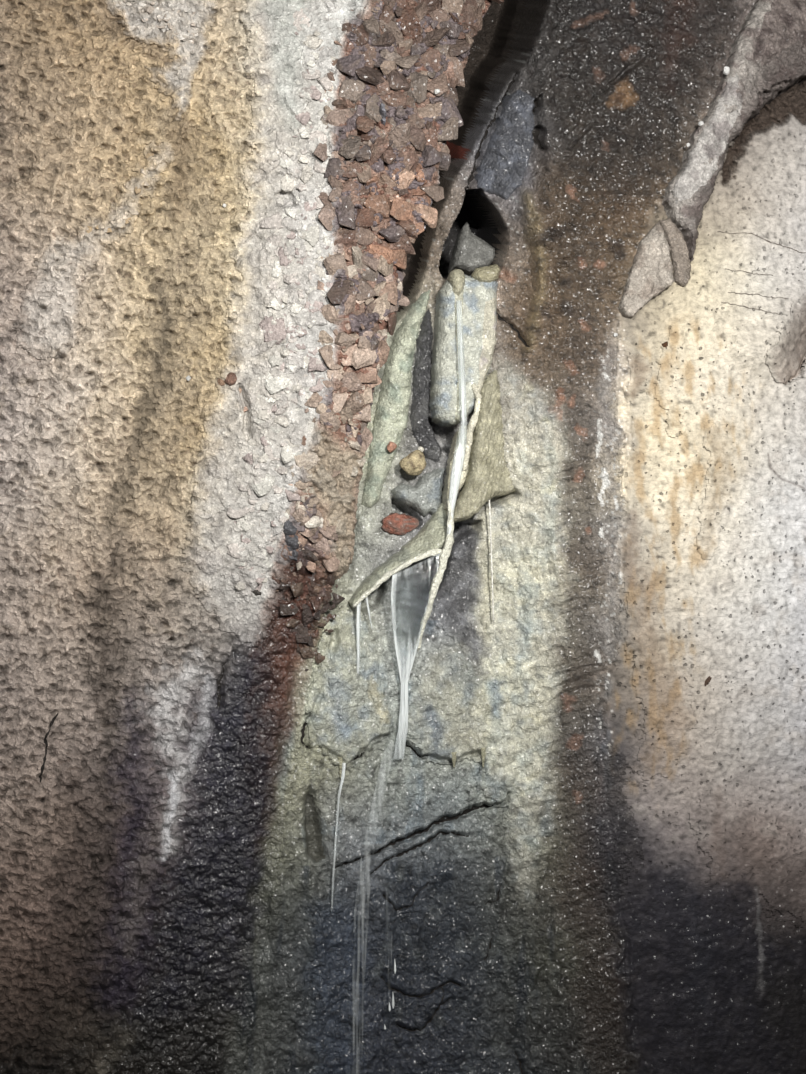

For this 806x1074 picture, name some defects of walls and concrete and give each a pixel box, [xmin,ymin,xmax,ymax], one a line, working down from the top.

crack [397,0,532,312]
crack [533,96,543,150]
flaking render [180,0,504,671]
crack [496,310,530,347]
rust [250,530,335,847]
water stain [303,0,806,1074]
crack [333,804,494,910]
crack [381,976,461,1032]